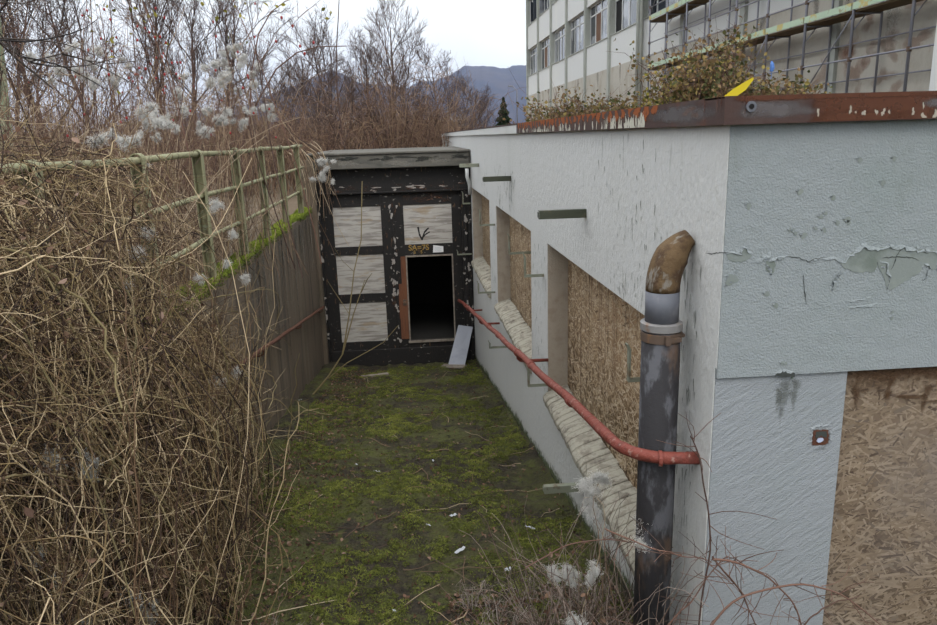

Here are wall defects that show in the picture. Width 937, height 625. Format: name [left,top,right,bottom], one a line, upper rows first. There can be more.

corrosion [518,105,658,130]
corrosion [736,91,937,122]
peeling [724,247,787,286]
peeling [812,243,937,291]
corrosion [807,423,832,450]